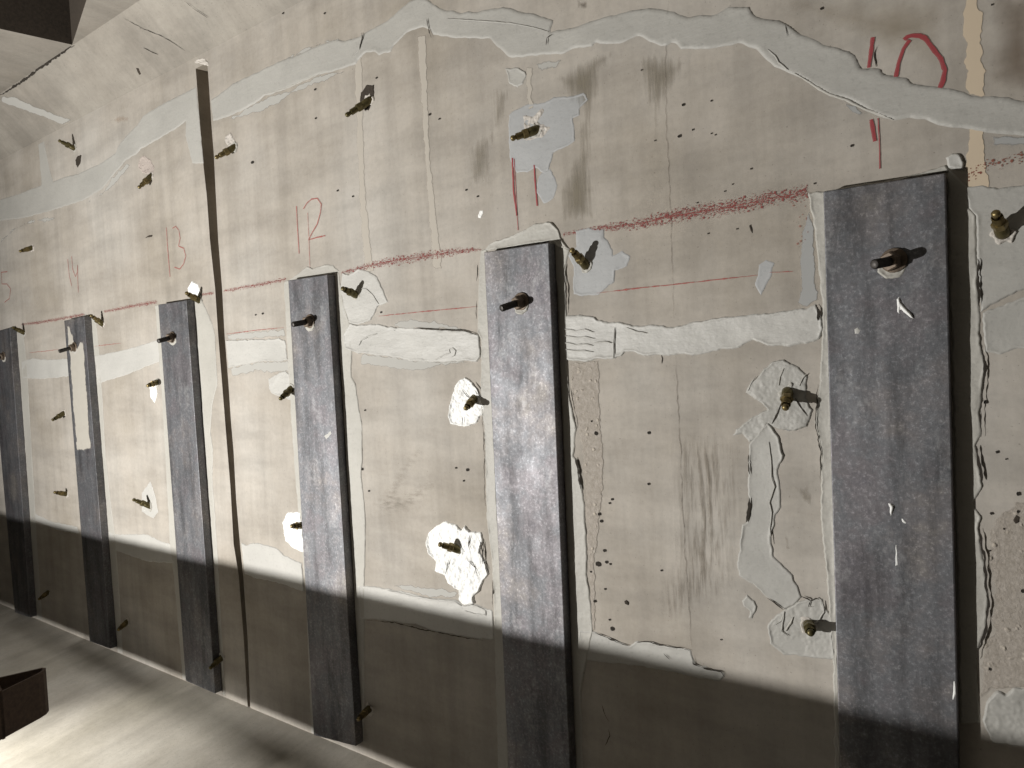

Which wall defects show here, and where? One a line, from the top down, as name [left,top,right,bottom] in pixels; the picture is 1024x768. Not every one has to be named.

spalling [360,85,374,110]
spalling [523,108,550,141]
crack [974,260,982,306]
crack [976,344,986,481]
spalling [570,361,603,630]
crack [976,529,990,659]
spalling [980,503,1024,696]